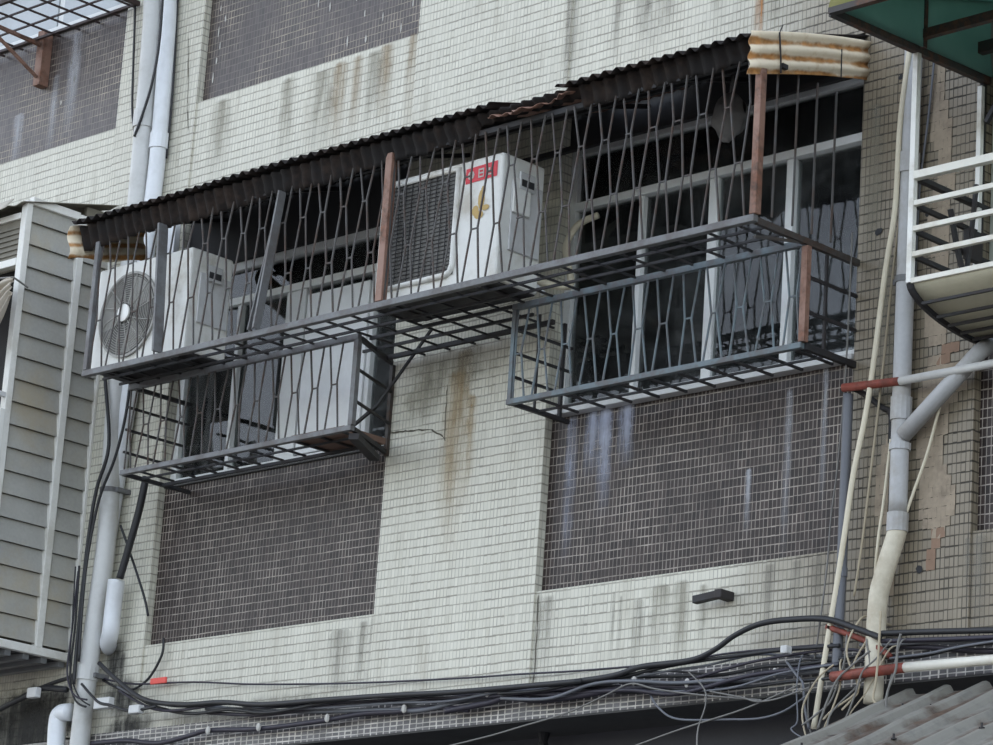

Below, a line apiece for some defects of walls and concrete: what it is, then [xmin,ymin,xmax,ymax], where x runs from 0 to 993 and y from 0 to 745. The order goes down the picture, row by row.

spalling [917,313,960,407]
crack [390,386,448,440]
leakage [590,409,610,467]
spalling [916,380,967,549]
leakage [0,693,66,745]